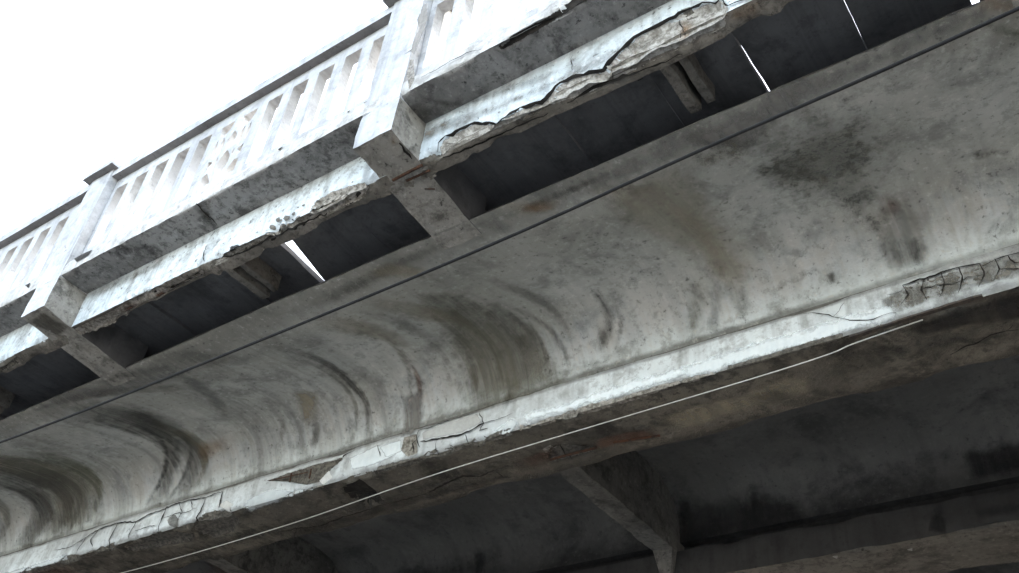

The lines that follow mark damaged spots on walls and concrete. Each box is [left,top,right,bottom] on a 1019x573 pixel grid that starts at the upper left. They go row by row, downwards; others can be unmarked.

spalling [437,0,743,158]
spalling [392,164,437,190]
damp [766,129,869,182]
spalling [215,181,369,262]
crack [803,252,1019,321]
damp [111,413,208,484]
crack [416,411,512,455]
peeling [11,259,1019,573]
damp [969,447,1019,475]
damp [0,457,101,543]
crack [58,491,223,553]
crack [274,470,507,537]